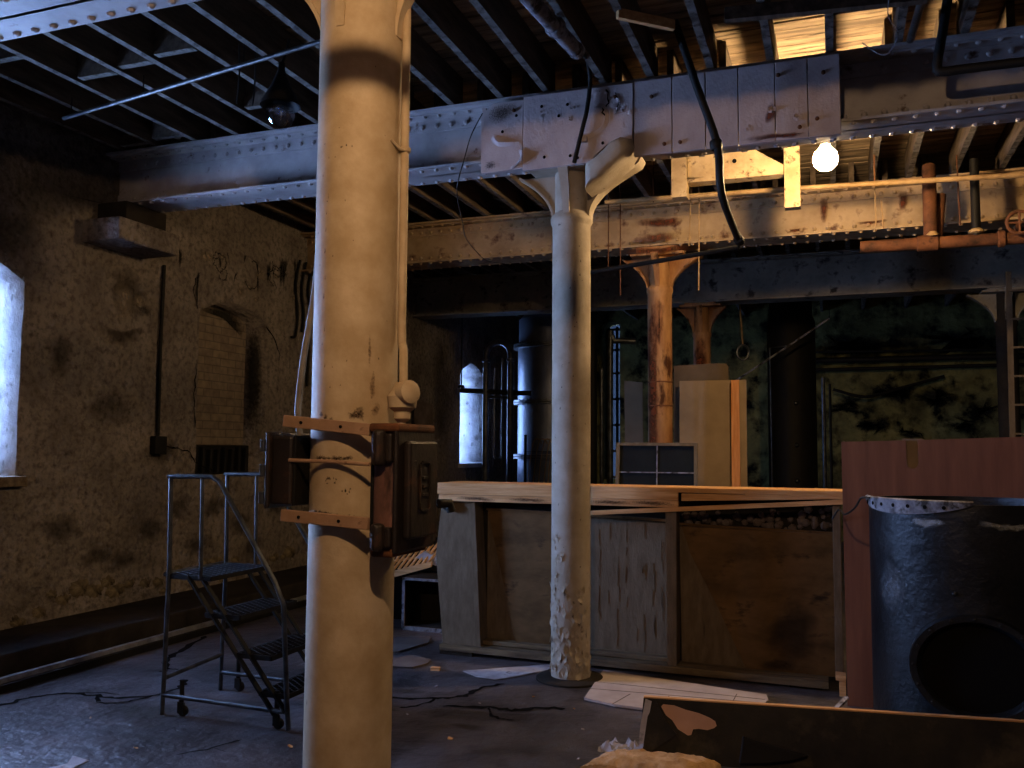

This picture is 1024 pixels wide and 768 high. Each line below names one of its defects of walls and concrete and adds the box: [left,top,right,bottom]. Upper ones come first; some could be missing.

corrosion [635,218,679,254]
corrosion [648,317,660,443]
peeling [550,534,591,680]
crack [392,683,565,721]